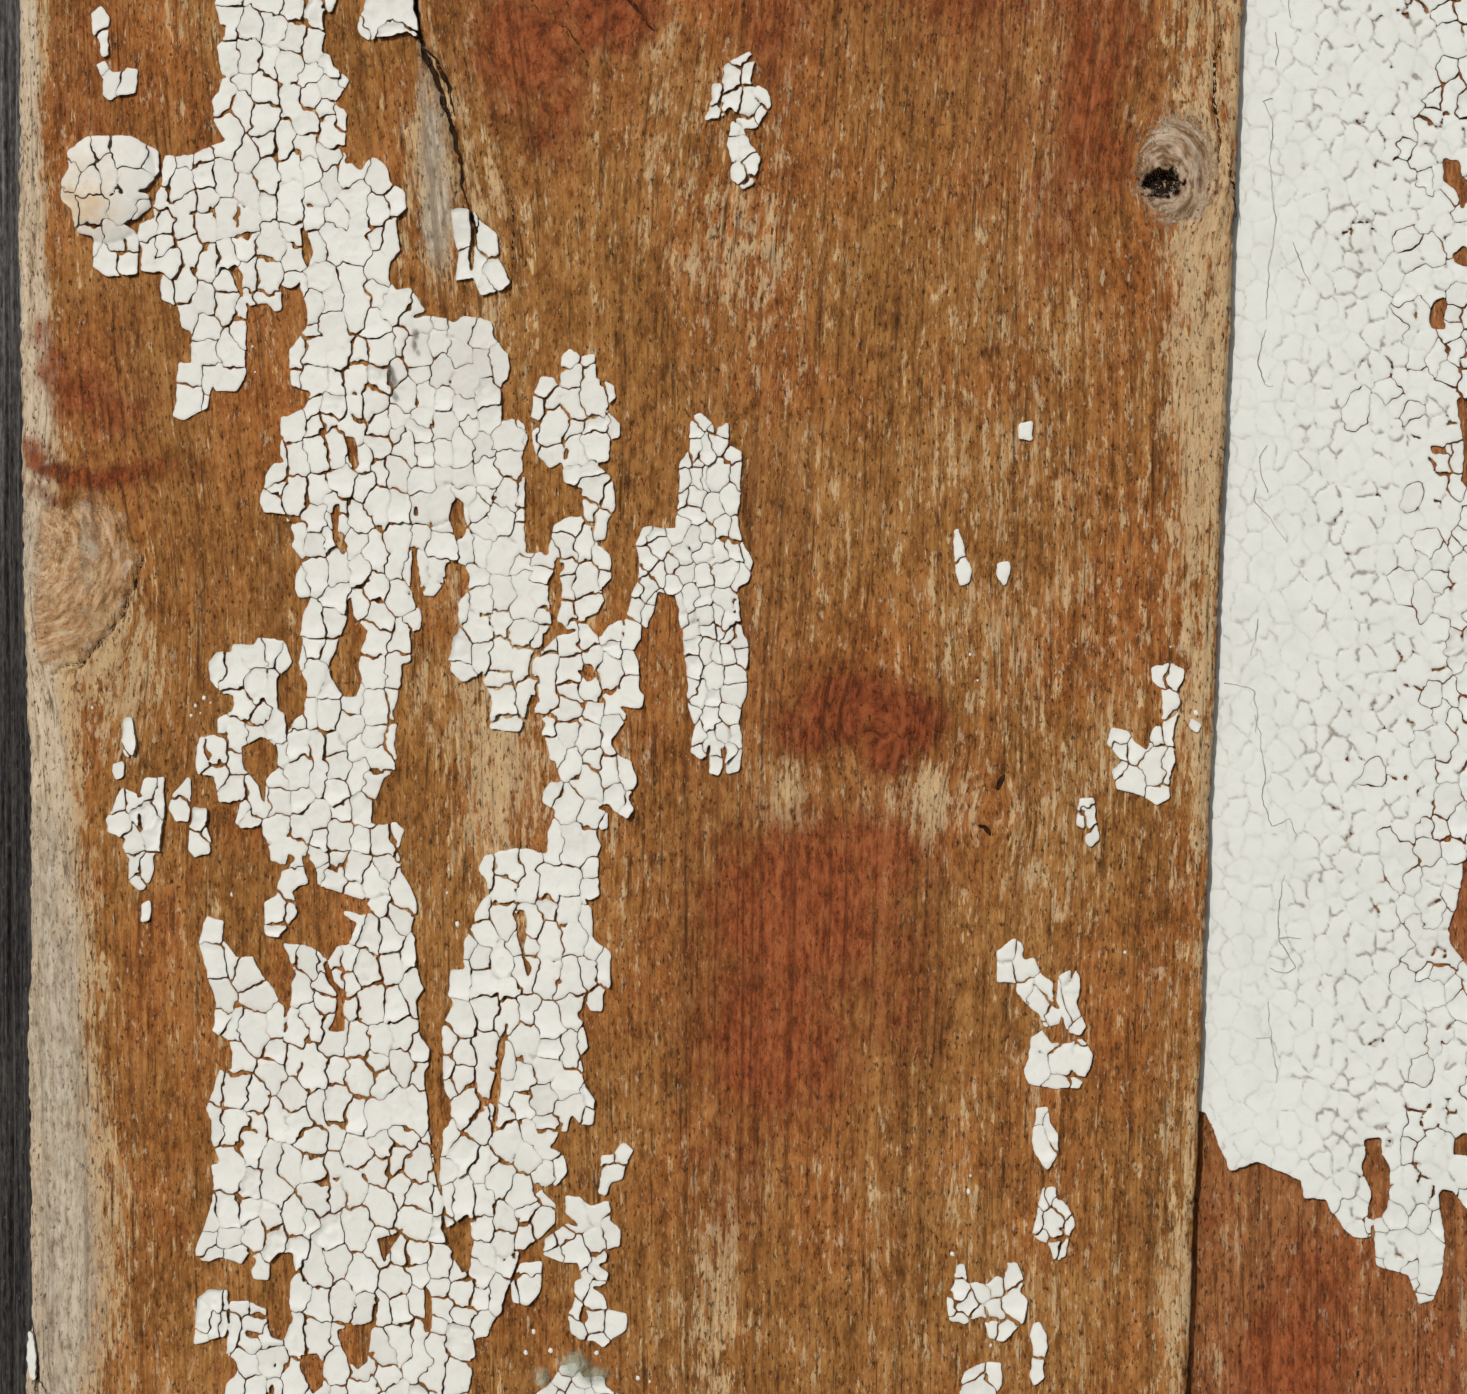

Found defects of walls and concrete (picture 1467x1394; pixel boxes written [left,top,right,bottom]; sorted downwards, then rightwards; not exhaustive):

peeling [91,6,138,100]
crack [413,0,515,295]
peeling [705,52,771,189]
crack [1212,18,1237,217]
crack [1257,0,1311,387]
crack [1254,445,1287,542]
crack [54,544,144,677]
peeling [106,0,753,1394]
crack [1225,620,1298,837]
peeling [1107,0,1467,1304]
peeling [996,939,1093,1089]
peeling [947,1262,1048,1385]